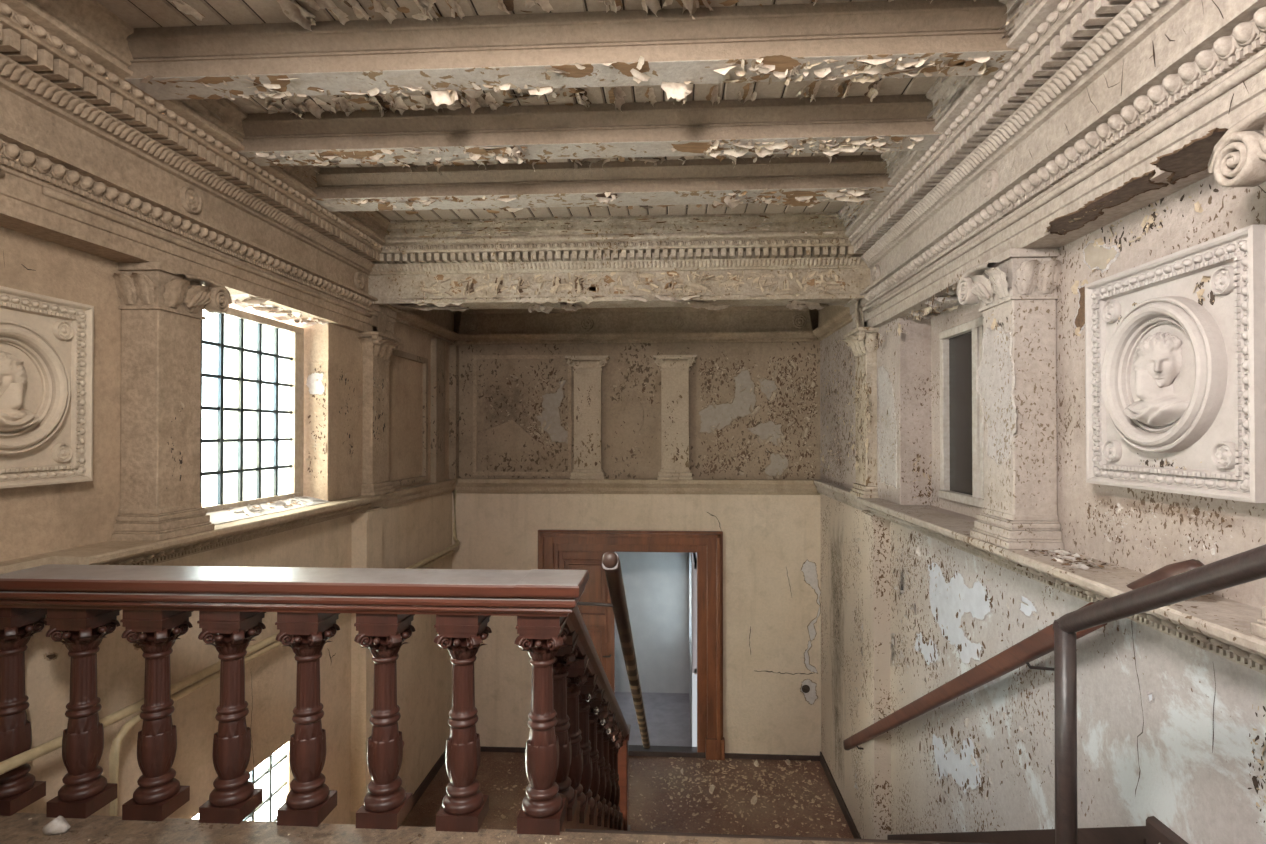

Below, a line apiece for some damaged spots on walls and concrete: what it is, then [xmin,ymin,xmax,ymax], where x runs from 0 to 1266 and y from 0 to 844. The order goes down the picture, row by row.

peeling [498,0,553,14]
peeling [641,0,739,19]
peeling [255,145,546,189]
peeling [571,135,924,178]
peeling [351,188,872,240]
peeling [396,269,846,314]
spalling [698,274,962,489]
peeling [912,454,932,498]
spalling [800,559,821,705]
spalling [890,530,1039,694]
spalling [916,707,1054,804]
peeling [1248,705,1266,832]